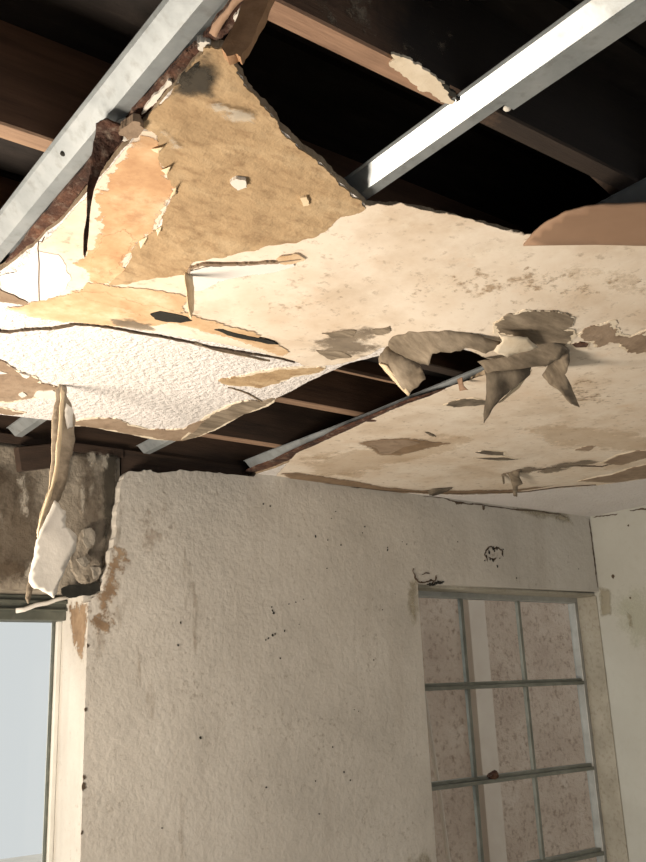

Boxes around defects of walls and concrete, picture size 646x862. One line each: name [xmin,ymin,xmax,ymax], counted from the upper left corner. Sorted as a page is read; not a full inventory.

peeling [109,46,365,286]
peeling [0,251,71,305]
damp [6,131,646,496]
crack [0,323,295,363]
peeling [0,360,58,415]
peeling [75,398,276,441]
crack [228,387,264,404]
peeling [218,366,326,388]
peeling [443,397,485,408]
damp [88,453,117,573]